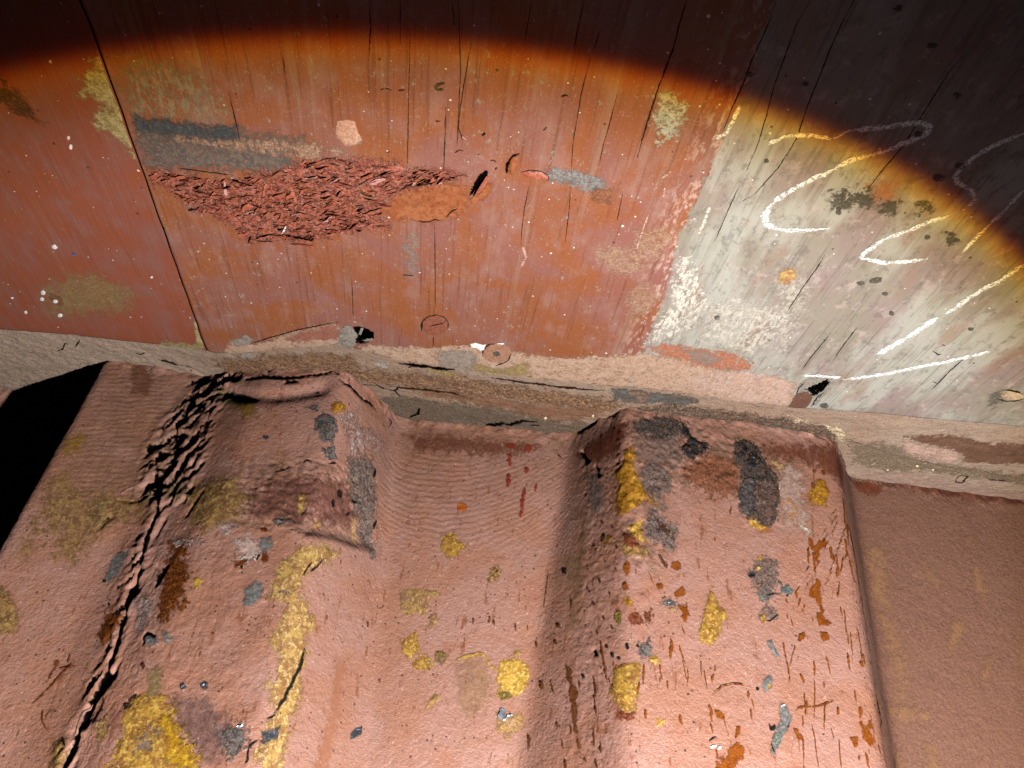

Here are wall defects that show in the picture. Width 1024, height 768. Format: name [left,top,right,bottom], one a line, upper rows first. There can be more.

water stain [107,48,348,175]
peeling [76,48,493,248]
peeling [543,167,615,205]
mould [827,184,934,217]
crack [486,419,539,427]
crack [494,378,604,391]
peeling [358,253,809,407]
corrosion [645,342,754,375]
crack [70,536,168,761]
corrosion [157,473,257,624]
corrosion [783,455,882,768]